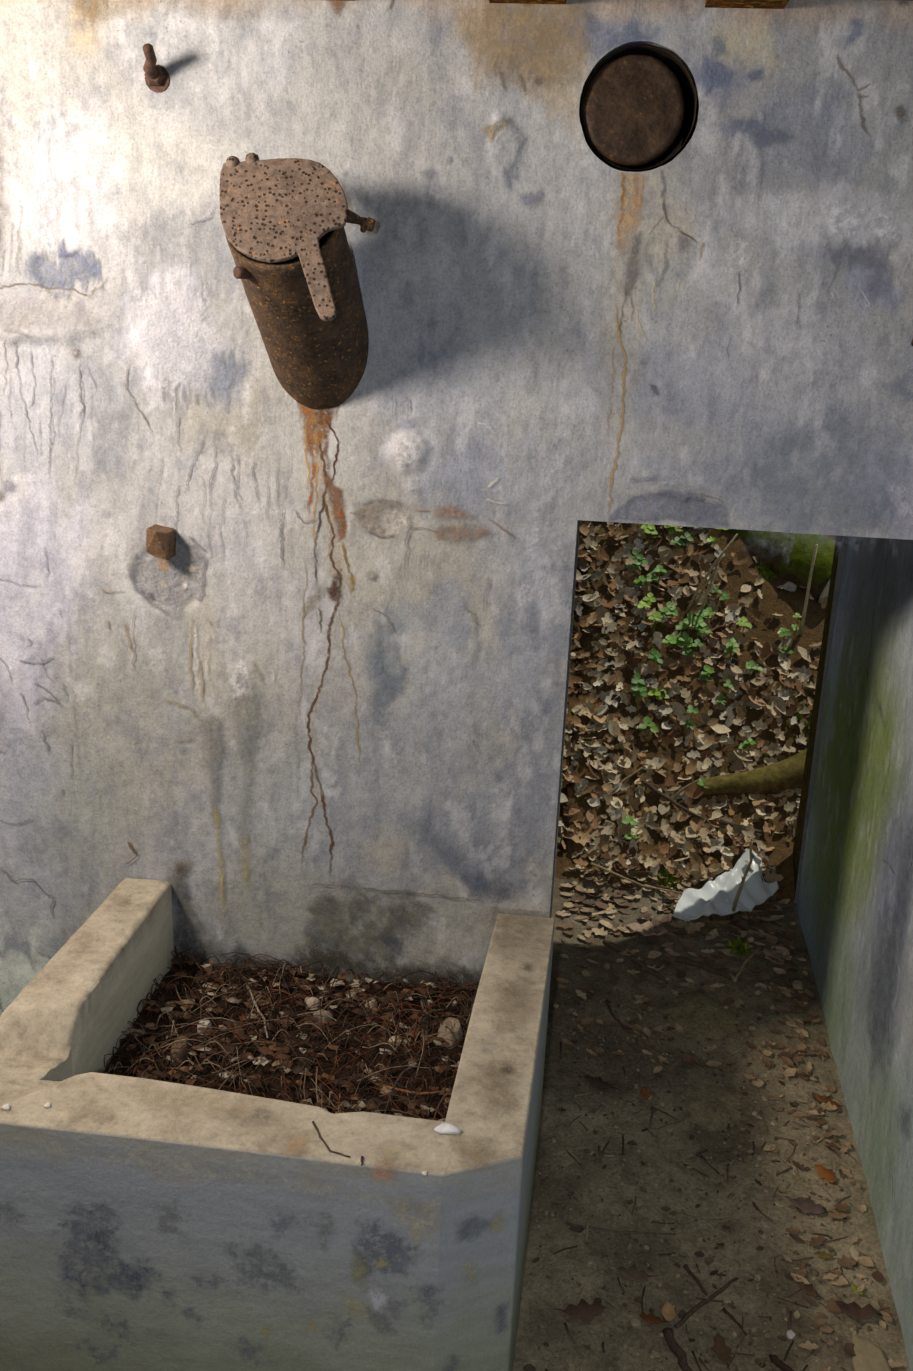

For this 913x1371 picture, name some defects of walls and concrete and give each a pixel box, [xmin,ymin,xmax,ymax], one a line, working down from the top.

crack [837,57,868,131]
rust [617,175,644,246]
crack [125,369,179,430]
rust [608,329,627,505]
spalling [130,535,206,612]
rust [298,403,360,858]
water stain [172,865,481,988]
water stain [354,1204,433,1331]